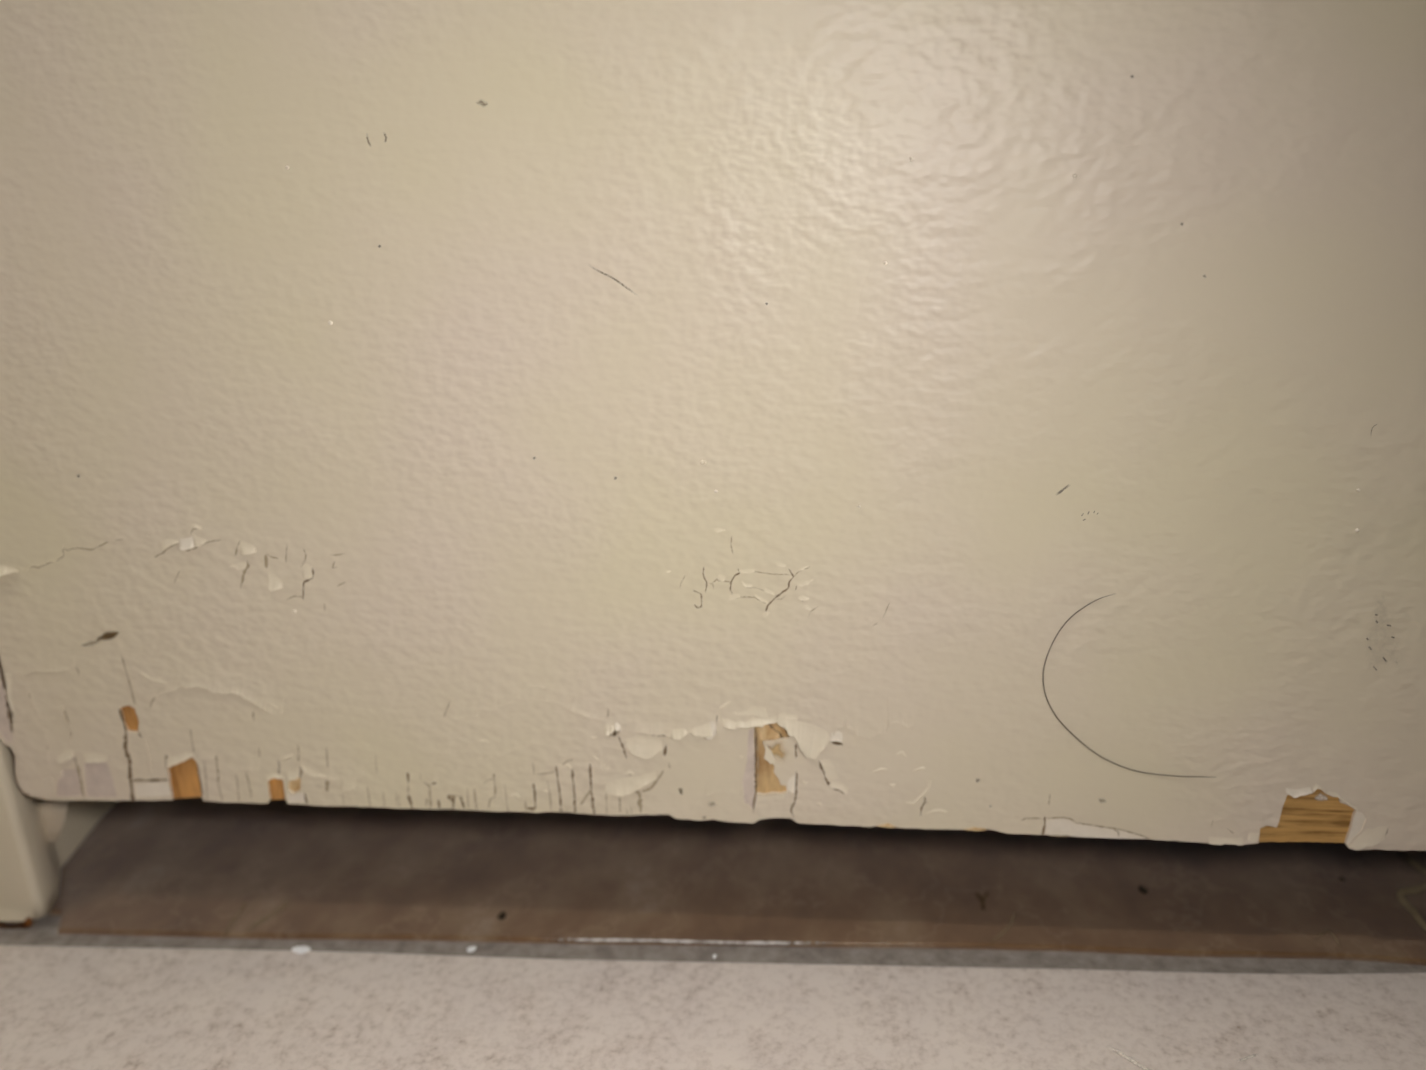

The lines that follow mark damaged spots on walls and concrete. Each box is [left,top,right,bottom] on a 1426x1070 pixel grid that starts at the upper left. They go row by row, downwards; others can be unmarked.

peeling [155,523,221,557]
peeling [230,541,314,601]
crack [665,527,819,618]
peeling [83,752,117,797]
crack [121,655,155,801]
peeling [132,752,203,799]
peeling [266,761,326,804]
crack [342,755,609,815]
peeling [565,694,865,819]
peeling [40,801,68,841]
peeling [1209,784,1388,850]